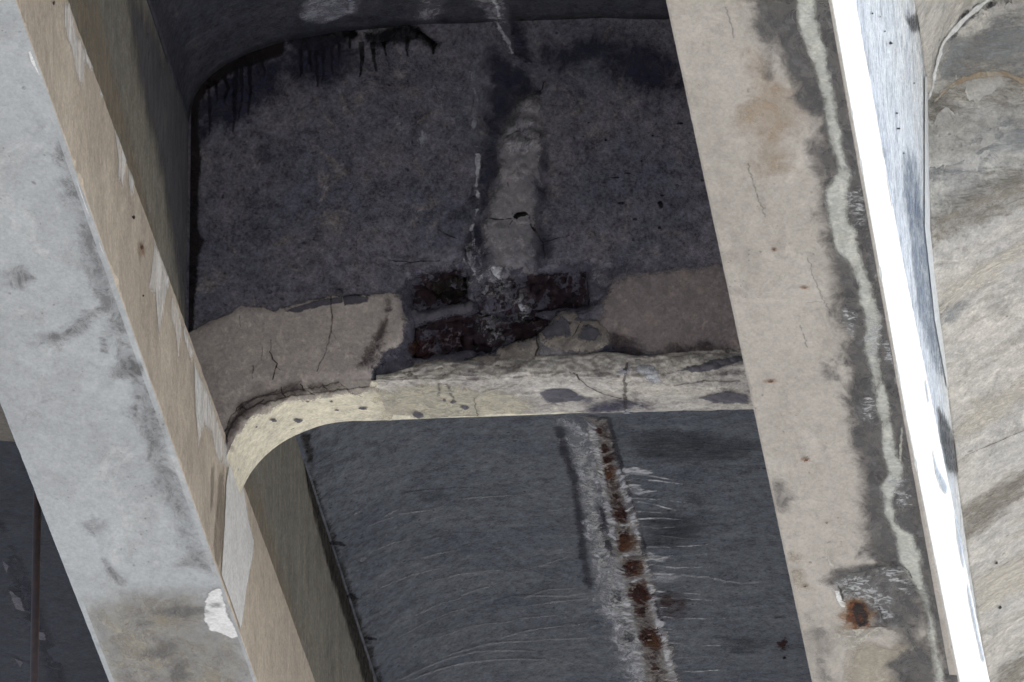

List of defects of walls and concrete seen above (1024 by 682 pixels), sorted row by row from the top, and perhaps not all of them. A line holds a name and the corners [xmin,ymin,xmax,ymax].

leakage [103,0,445,682]
crack [224,310,370,445]
peeling [189,92,741,452]
crack [574,352,628,414]
leakage [671,341,748,404]
leakage [753,0,958,682]
leakage [544,398,649,682]
spalling [583,417,684,682]